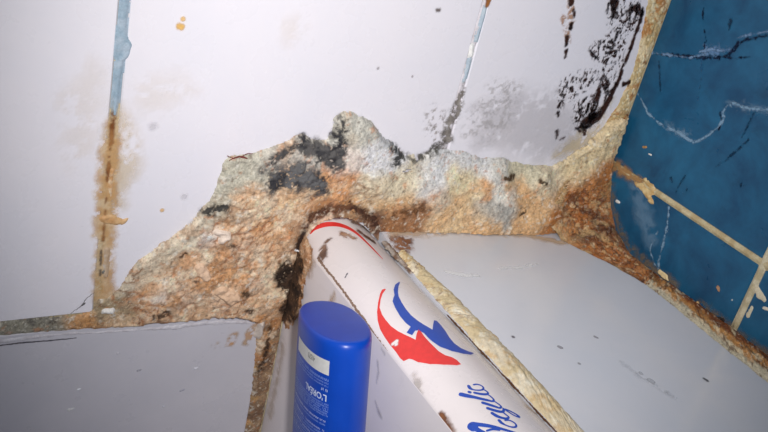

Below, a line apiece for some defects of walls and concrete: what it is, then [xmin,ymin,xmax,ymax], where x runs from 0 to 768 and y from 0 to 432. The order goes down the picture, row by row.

rust [93,113,131,302]
flaking render [92,182,357,339]
water stain [261,116,348,196]
water stain [274,201,382,323]
water stain [391,91,465,167]
water stain [555,0,644,154]